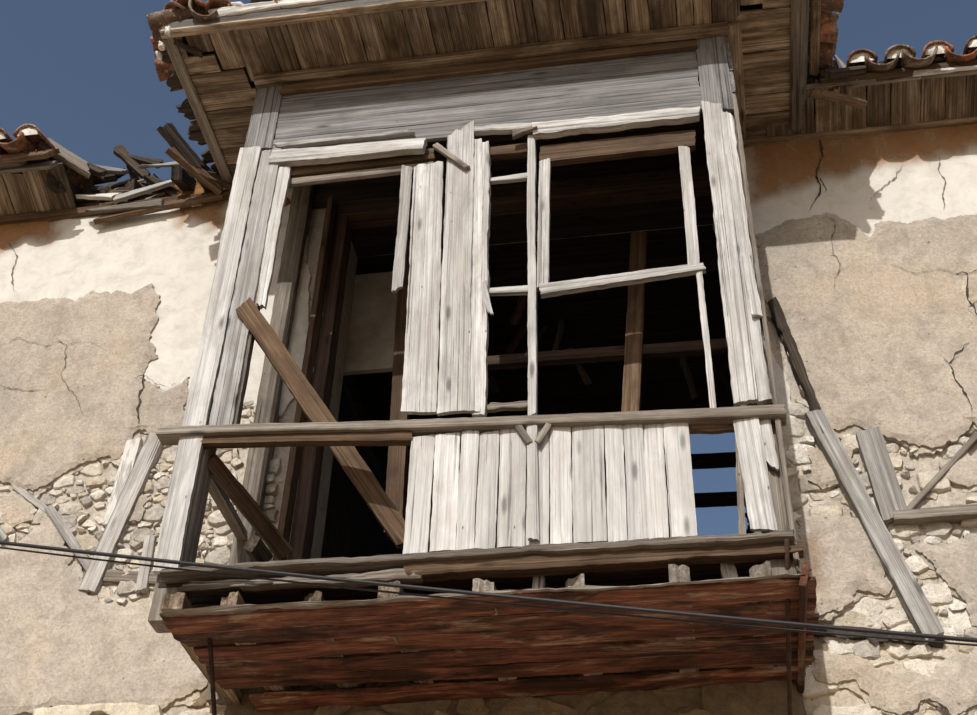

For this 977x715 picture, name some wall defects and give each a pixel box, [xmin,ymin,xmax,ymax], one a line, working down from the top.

water stain [754,108,977,198]
crack [810,139,840,288]
crack [890,264,977,317]
crack [0,335,99,412]
crack [943,342,972,413]
spalling [216,448,249,484]
spalling [781,399,857,540]
spalling [884,423,977,509]
spalling [0,455,122,581]
spalling [88,445,178,612]
spalling [196,493,234,565]
spalling [163,518,977,715]